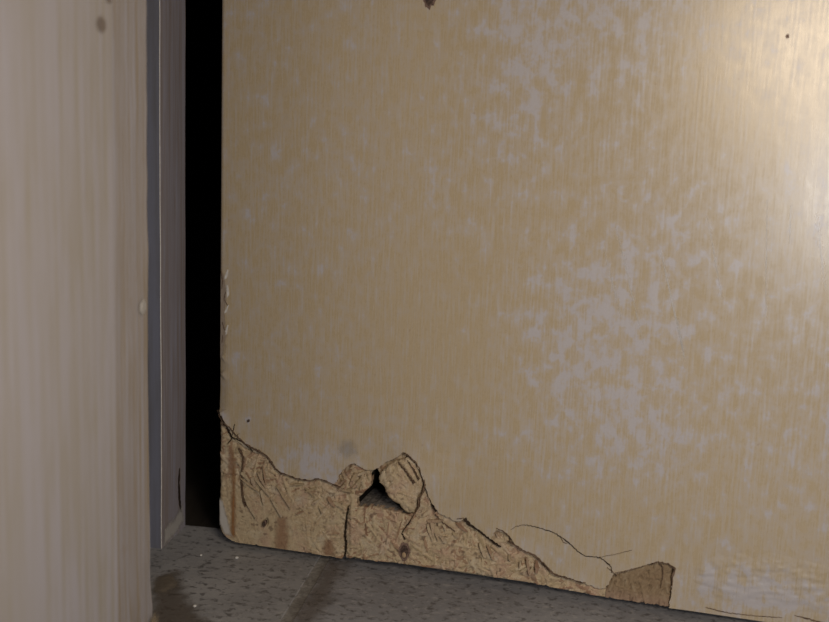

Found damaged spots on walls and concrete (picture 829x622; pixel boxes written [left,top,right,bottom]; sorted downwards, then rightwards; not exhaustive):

spalling [220,421,676,606]
crack [398,453,631,583]